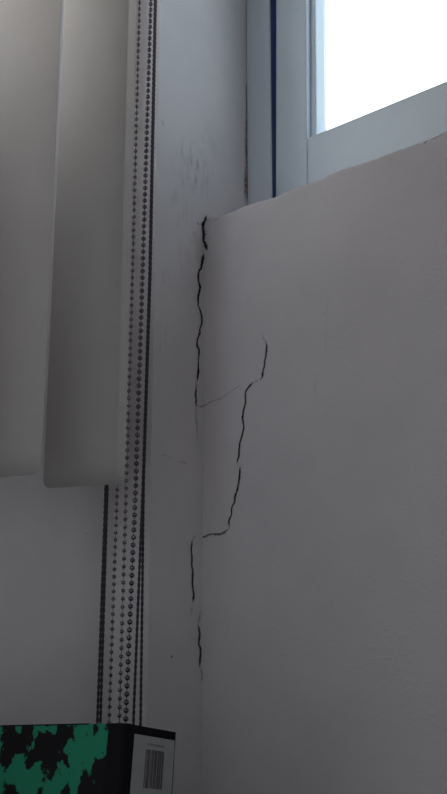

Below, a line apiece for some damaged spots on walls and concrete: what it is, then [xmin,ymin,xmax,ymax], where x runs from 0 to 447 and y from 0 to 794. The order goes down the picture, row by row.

crack [195,215,207,406]
crack [191,344,267,601]
crack [196,626,204,679]